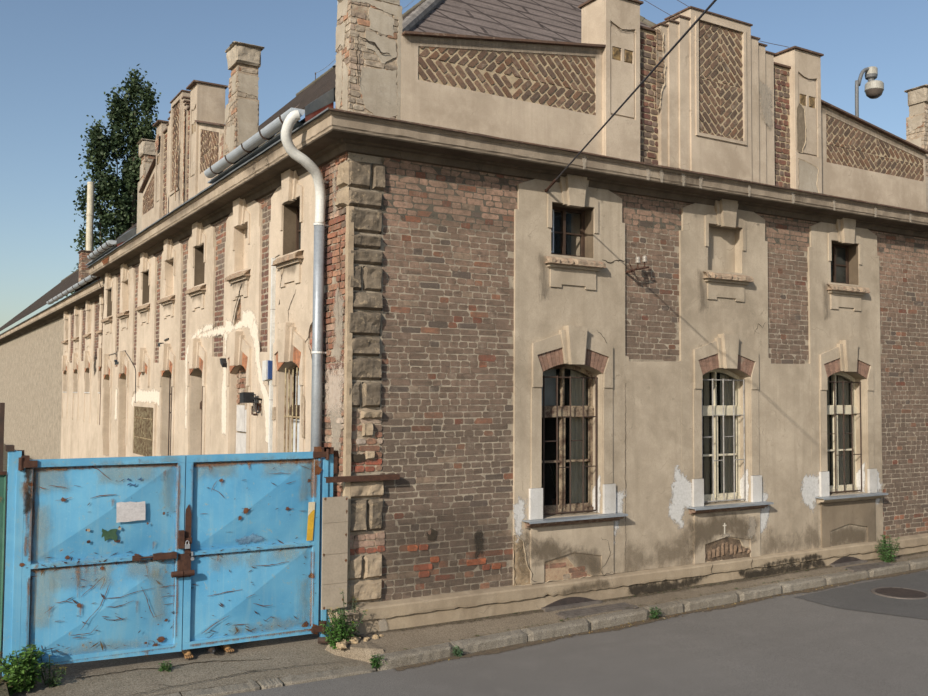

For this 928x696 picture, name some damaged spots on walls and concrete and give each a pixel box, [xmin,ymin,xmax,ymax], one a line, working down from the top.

flaking render [335,0,398,115]
flaking render [906,105,928,177]
corrosion [194,446,326,500]
corrosion [19,463,180,648]
corrosion [192,546,325,646]